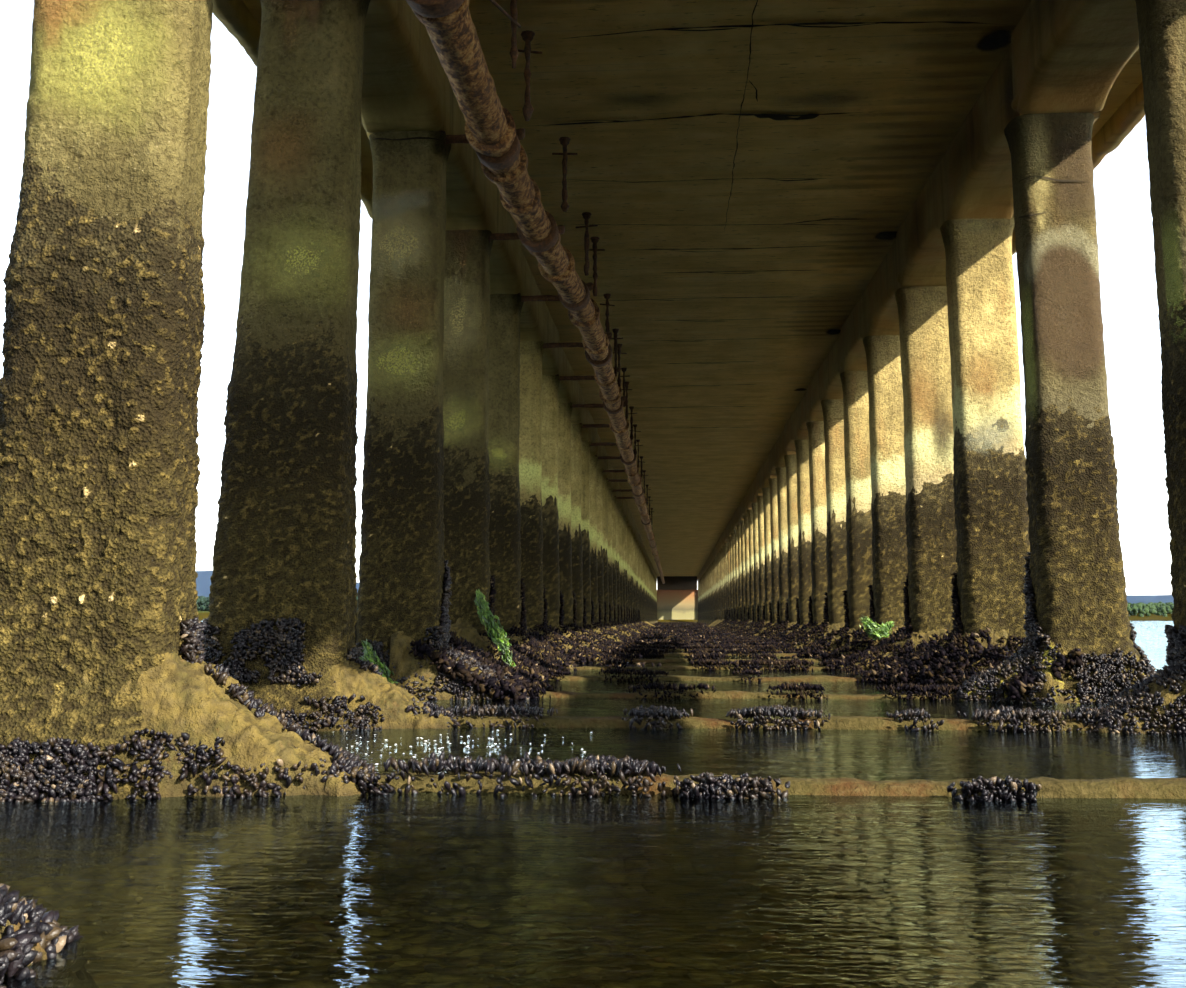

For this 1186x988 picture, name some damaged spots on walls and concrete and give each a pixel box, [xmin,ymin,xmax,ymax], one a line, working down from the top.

crack [537,0,1008,428]